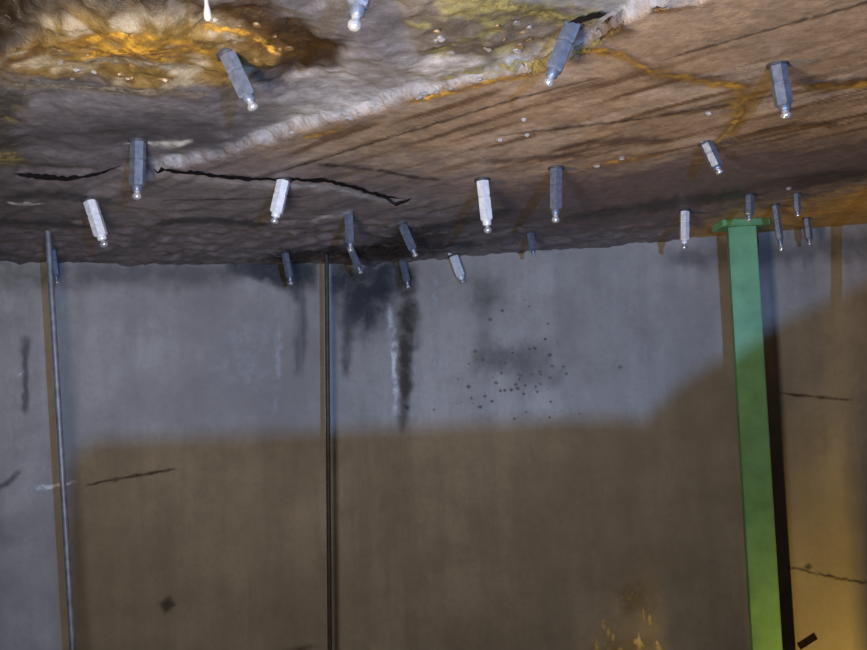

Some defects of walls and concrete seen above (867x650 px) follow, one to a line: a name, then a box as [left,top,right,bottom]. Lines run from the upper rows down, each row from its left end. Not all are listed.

spalling [0,0,718,182]
crack [153,164,436,206]
damp [232,218,481,419]